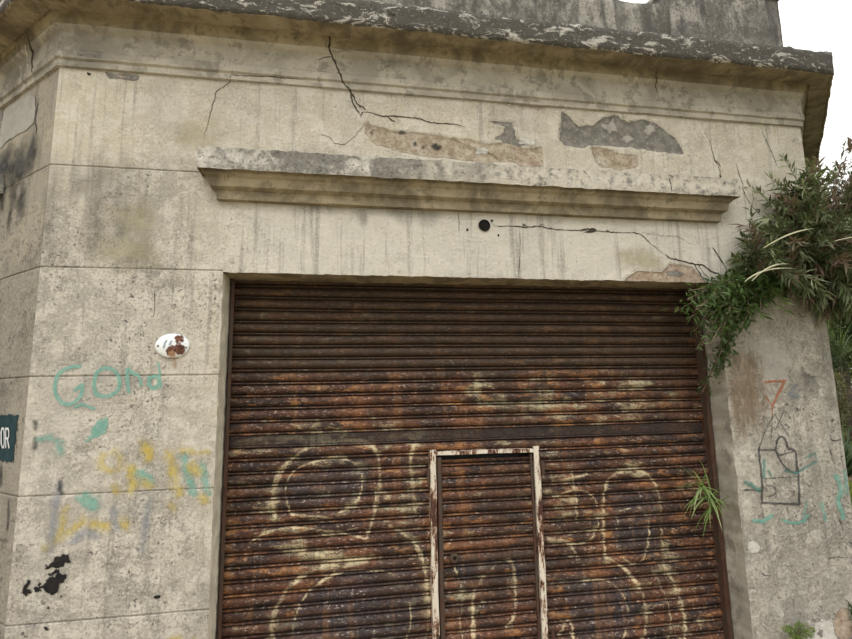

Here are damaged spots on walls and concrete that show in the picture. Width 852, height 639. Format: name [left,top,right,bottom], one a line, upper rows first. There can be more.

crack [25,31,38,131]
crack [204,74,305,136]
crack [319,36,465,127]
spalling [321,120,544,166]
spalling [559,111,683,170]
leakage [0,138,37,223]
crack [499,224,727,281]
spalling [620,255,704,283]